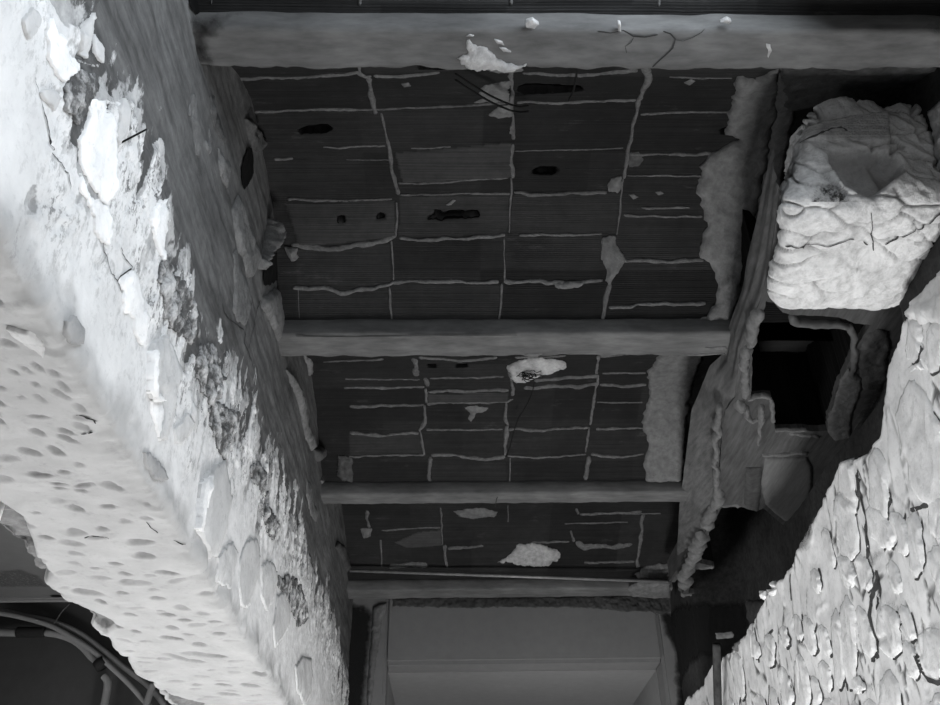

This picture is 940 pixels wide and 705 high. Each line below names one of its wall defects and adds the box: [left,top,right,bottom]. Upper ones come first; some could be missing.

peeling [21,7,131,245]
crack [800,126,848,143]
crack [785,213,940,251]
peeling [6,325,45,358]
spalling [62,315,85,345]
spalling [120,199,309,648]
peeling [728,319,940,705]
crack [903,503,928,520]
crack [855,469,886,639]
crack [789,577,817,643]
peeling [295,656,313,705]
crack [913,654,940,686]